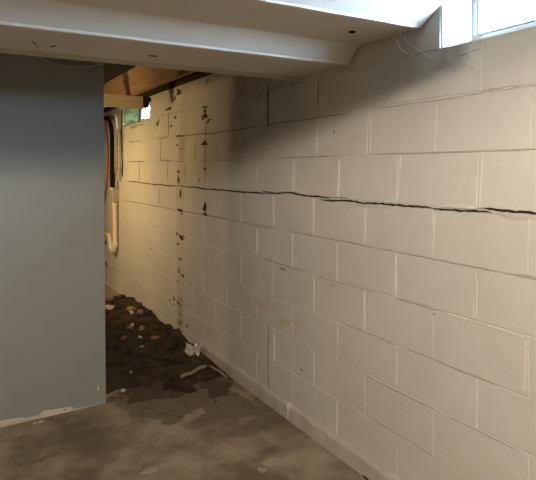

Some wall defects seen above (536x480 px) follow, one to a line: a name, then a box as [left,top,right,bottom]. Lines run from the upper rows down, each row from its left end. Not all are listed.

crack [128,79,536,214]
crack [127,201,276,229]